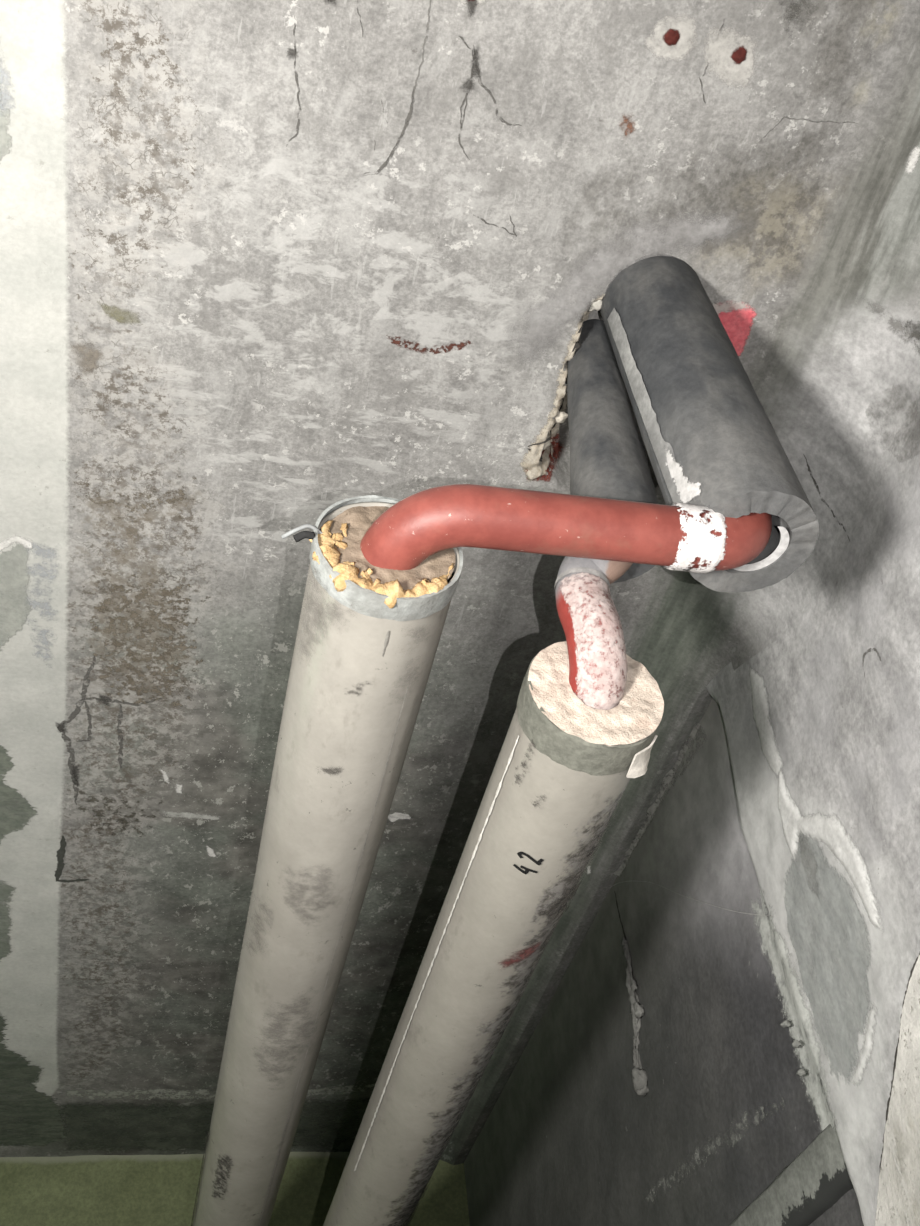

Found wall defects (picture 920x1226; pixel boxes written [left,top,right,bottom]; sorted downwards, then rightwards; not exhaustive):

crack [364,0,431,176]
crack [458,36,522,158]
spalling [520,294,605,481]
crack [57,655,162,805]
flaking render [875,955,920,1226]